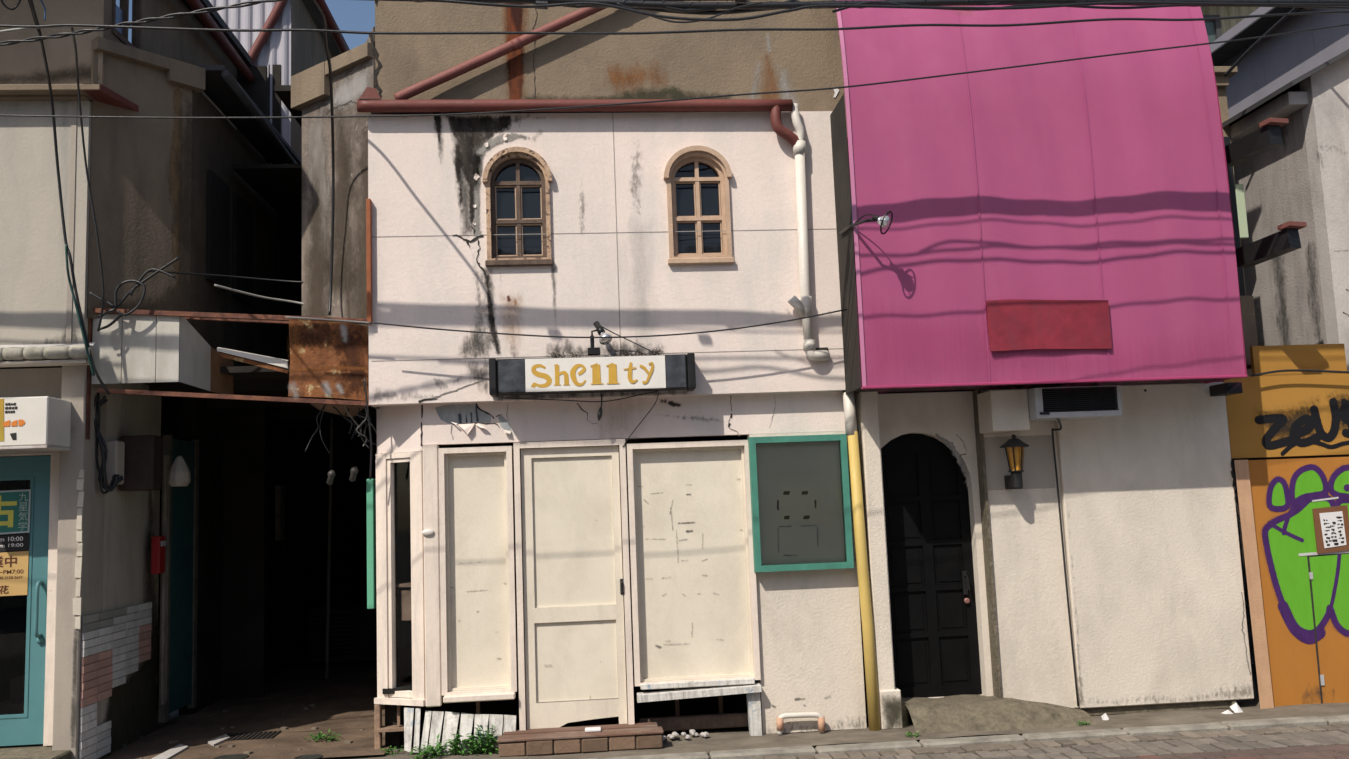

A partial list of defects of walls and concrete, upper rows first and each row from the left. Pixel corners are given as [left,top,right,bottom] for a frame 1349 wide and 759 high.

corrosion [293,320,368,396]
flaking render [435,403,511,438]